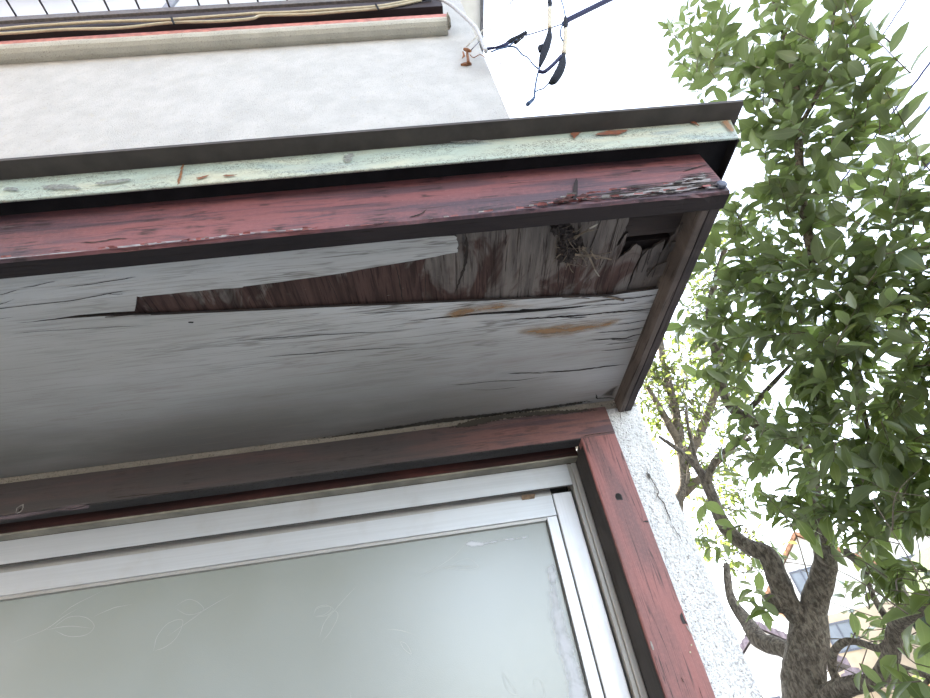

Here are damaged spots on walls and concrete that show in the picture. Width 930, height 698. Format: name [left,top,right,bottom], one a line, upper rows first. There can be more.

peeling [515,172,718,210]
peeling [0,227,322,259]
peeling [105,218,683,318]
crack [238,309,432,357]
damp [450,305,506,316]
crack [458,295,653,390]
damp [524,321,614,334]